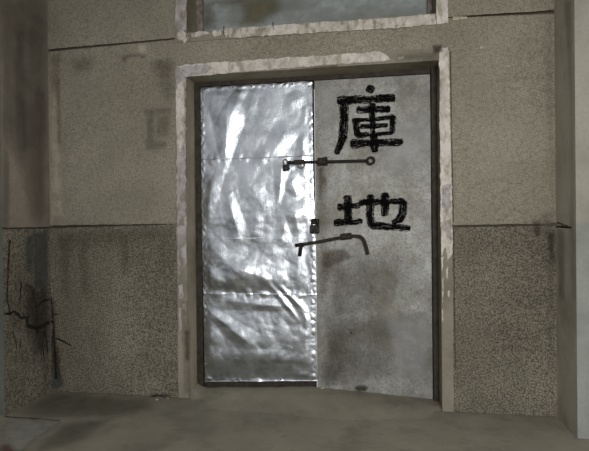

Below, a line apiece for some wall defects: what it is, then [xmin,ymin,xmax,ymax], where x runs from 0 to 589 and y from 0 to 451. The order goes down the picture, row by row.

peeling [439,47,453,303]
crack [4,240,72,379]